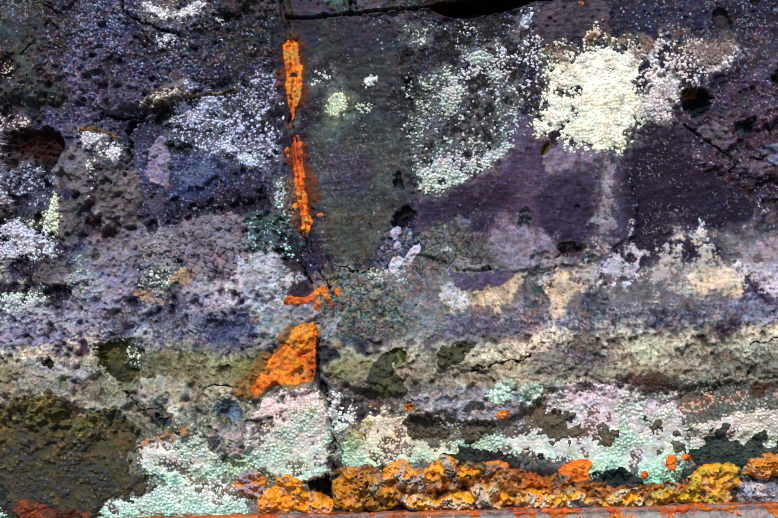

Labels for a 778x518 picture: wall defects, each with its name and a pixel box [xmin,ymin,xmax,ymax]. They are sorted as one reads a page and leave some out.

corrosion [273,35,324,237]
crack [683,124,764,173]
crack [298,237,375,293]
crack [728,254,776,316]
corrosion [232,285,341,400]
crack [316,323,337,470]
crack [469,353,533,372]
corrosion [495,410,510,421]
corrosion [616,367,687,397]
corrosion [749,381,778,398]
corrosion [12,498,90,518]
corrosion [234,452,778,518]